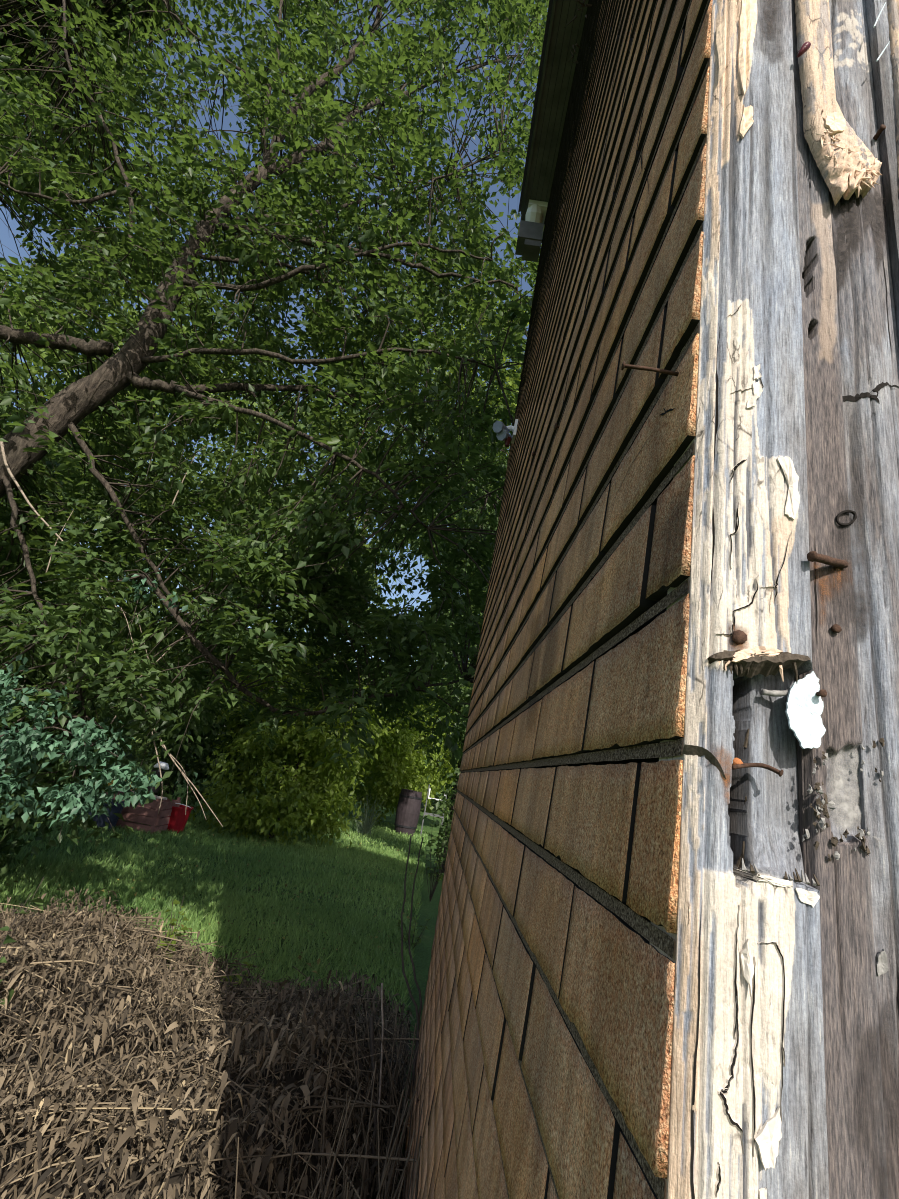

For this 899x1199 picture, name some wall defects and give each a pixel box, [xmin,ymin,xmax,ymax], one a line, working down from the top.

peeling [715,0,757,139]
peeling [824,112,846,136]
peeling [746,364,763,409]
peeling [776,456,800,520]
rust [718,758,743,800]
peeling [785,671,870,862]
peeling [875,949,889,976]
crack [691,905,785,1199]
peeling [754,1106,782,1171]